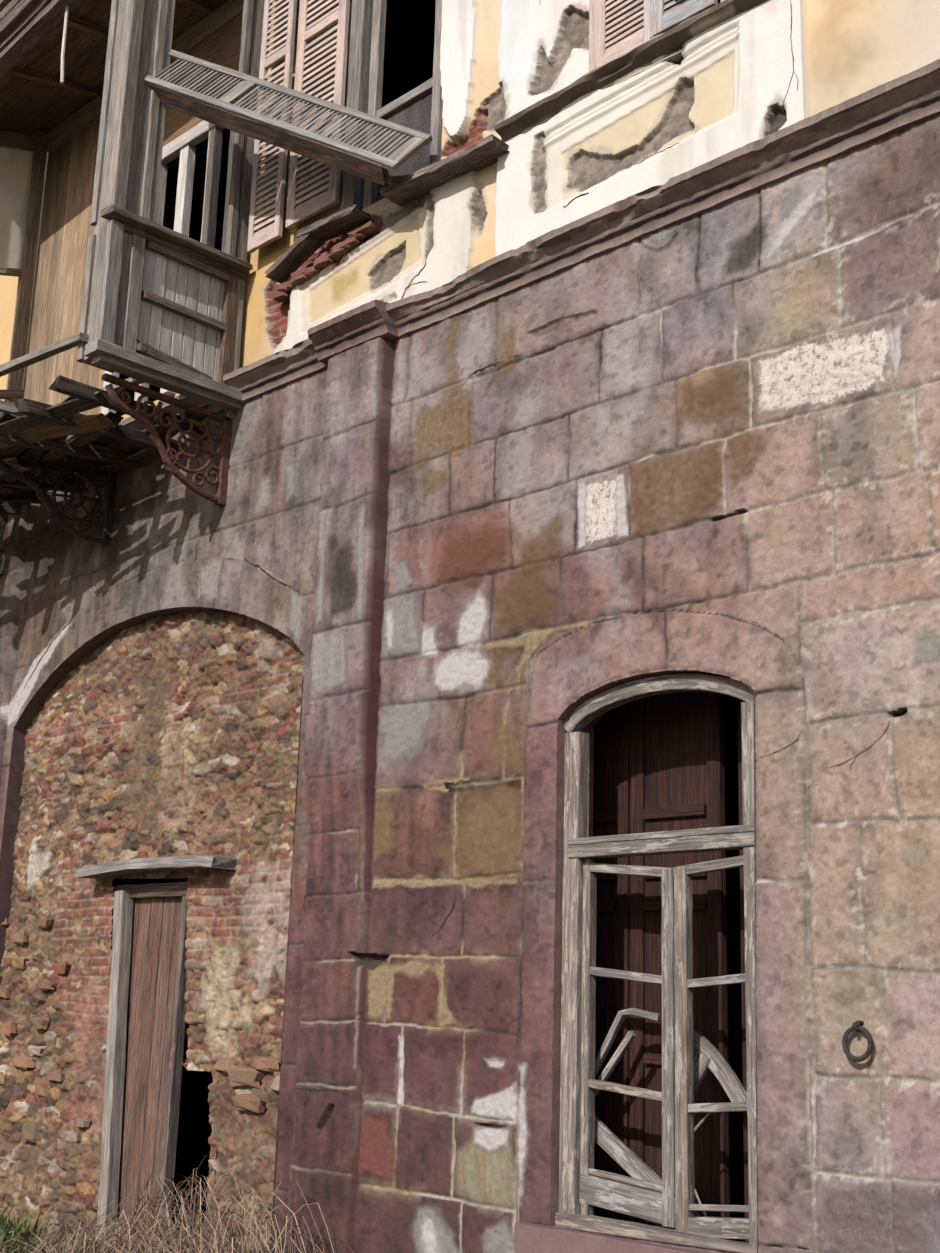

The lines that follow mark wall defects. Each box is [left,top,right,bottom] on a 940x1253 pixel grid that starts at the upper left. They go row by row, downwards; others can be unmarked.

flaking render [528,4,589,96]
crack [782,0,798,105]
flaking render [441,81,507,158]
flaking render [567,47,695,193]
flaking render [763,102,787,138]
flaking render [468,189,487,236]
flaking render [529,130,547,215]
flaking render [264,192,435,350]